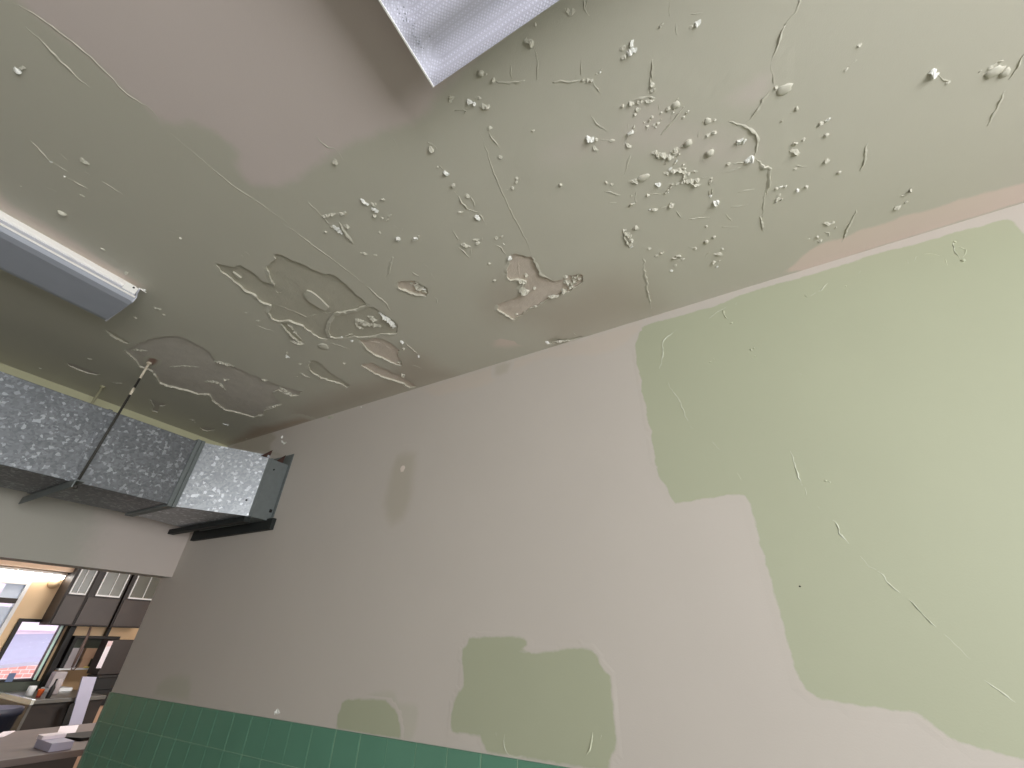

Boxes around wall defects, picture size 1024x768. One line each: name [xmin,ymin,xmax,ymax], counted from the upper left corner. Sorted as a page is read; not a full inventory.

crack [4,0,390,311]
peeling [308,202,377,257]
peeling [360,198,420,242]
crack [478,126,551,280]
peeling [585,98,689,153]
peeling [604,150,720,211]
crack [676,0,801,231]
crack [987,55,1024,126]
peeling [493,235,583,322]
peeling [104,254,420,426]
damp [376,443,425,536]
crack [833,520,970,659]